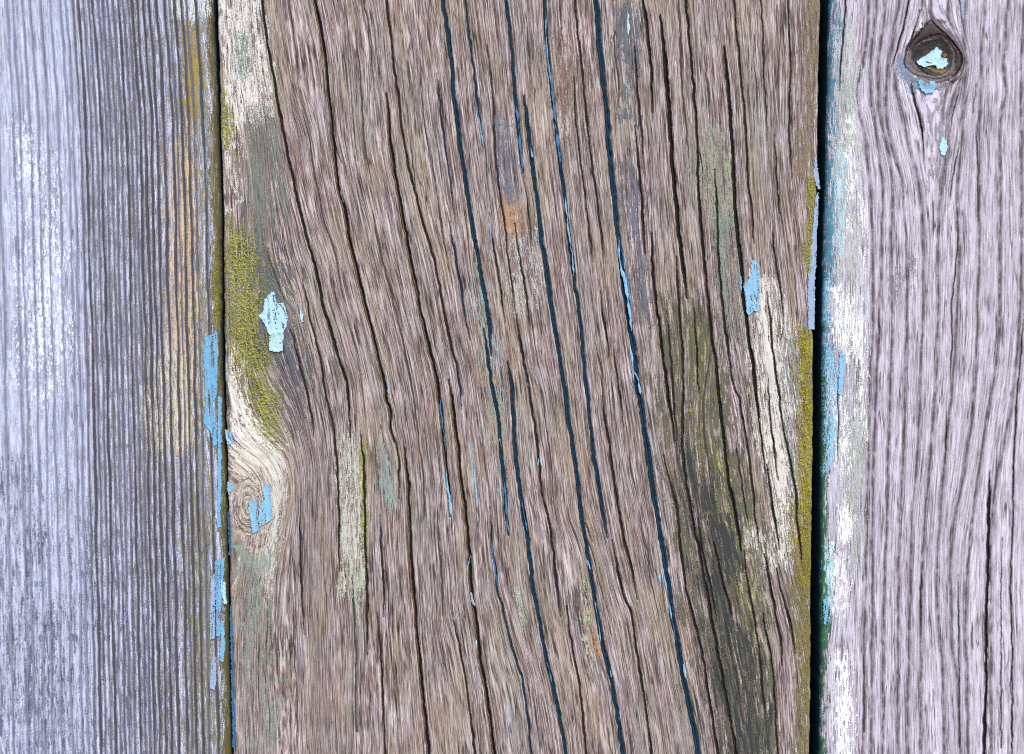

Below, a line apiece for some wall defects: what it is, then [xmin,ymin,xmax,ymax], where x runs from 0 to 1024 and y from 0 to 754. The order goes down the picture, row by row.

peeling [917,47,948,94]
peeling [939,137,948,155]
damp [0,0,325,754]
peeling [258,291,304,352]
crack [261,0,802,754]
peeling [739,260,760,315]
damp [774,330,803,504]
peeling [808,0,849,477]
peeling [203,331,236,748]
peeling [248,485,273,533]
damp [670,430,774,754]
peeling [821,544,836,625]